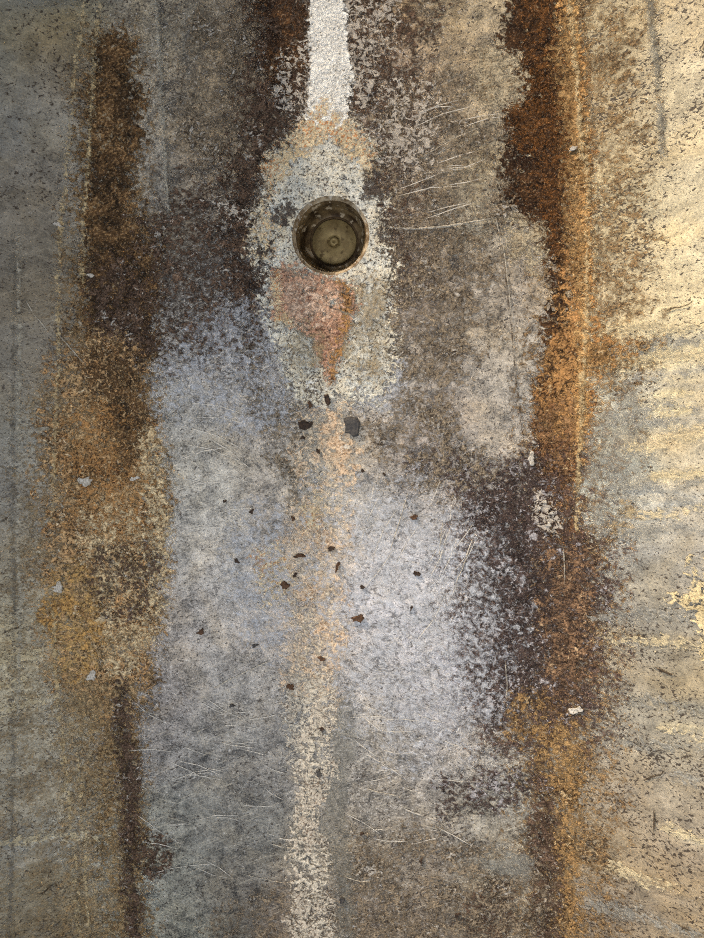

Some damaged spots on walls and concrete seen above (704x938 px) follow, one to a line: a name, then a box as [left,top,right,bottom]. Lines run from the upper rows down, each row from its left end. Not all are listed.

leakage [154,0,503,938]
rust [194,0,671,938]